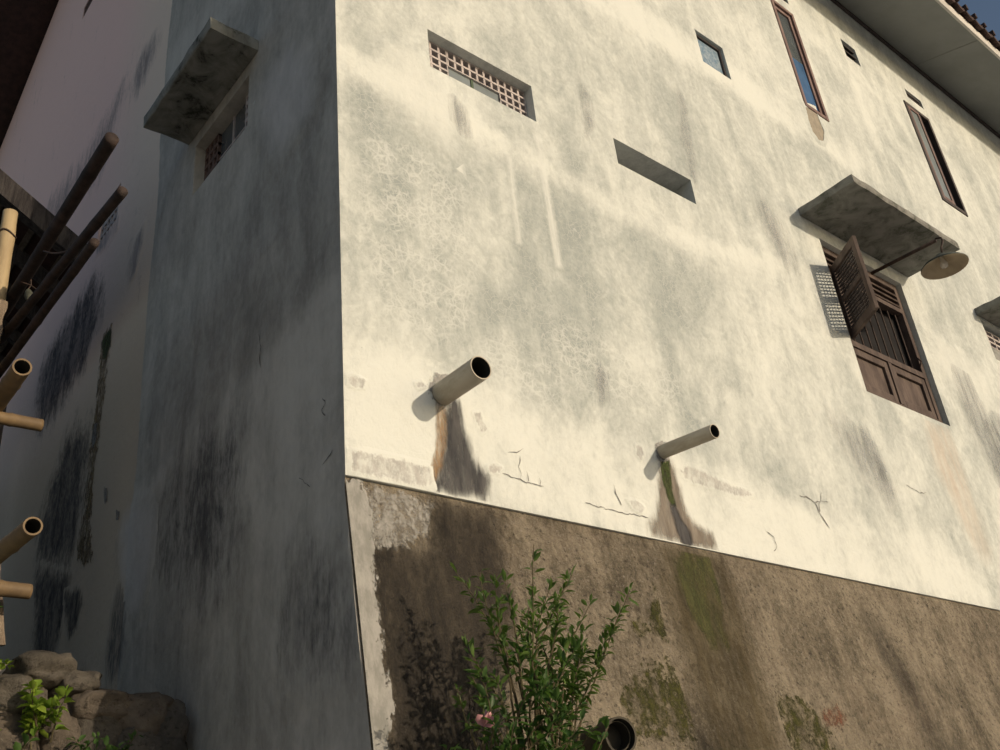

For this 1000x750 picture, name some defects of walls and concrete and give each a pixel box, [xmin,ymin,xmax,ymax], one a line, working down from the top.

leakage [42,10,169,226]
crack [338,101,704,486]
flaking render [801,101,828,147]
leakage [146,348,366,735]
leakage [372,400,513,750]
leakage [642,458,798,750]